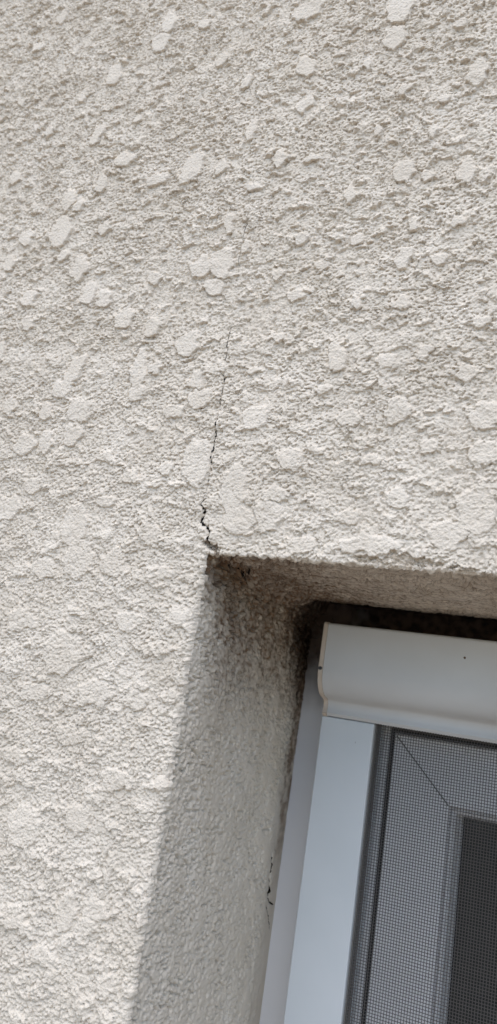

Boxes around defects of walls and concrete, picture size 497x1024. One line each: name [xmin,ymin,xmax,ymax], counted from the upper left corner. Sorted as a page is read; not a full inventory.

crack [200,332,230,544]